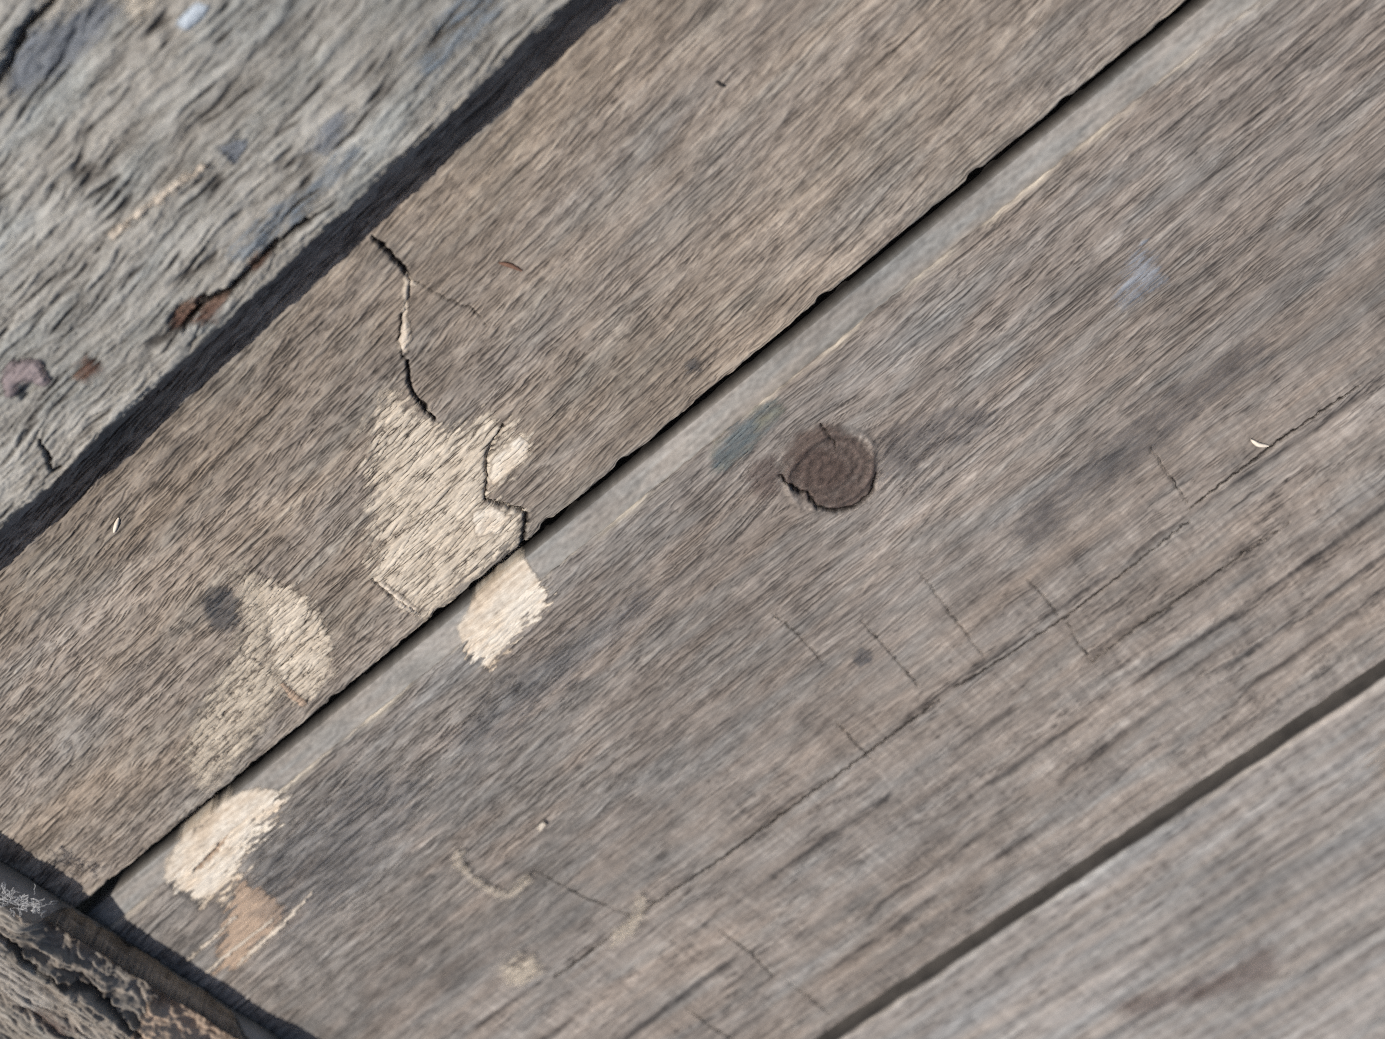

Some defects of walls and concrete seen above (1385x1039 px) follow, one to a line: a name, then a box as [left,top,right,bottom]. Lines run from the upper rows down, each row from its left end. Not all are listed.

crack [372,236,477,419]
peeling [358,389,557,672]
peeling [17,566,336,988]